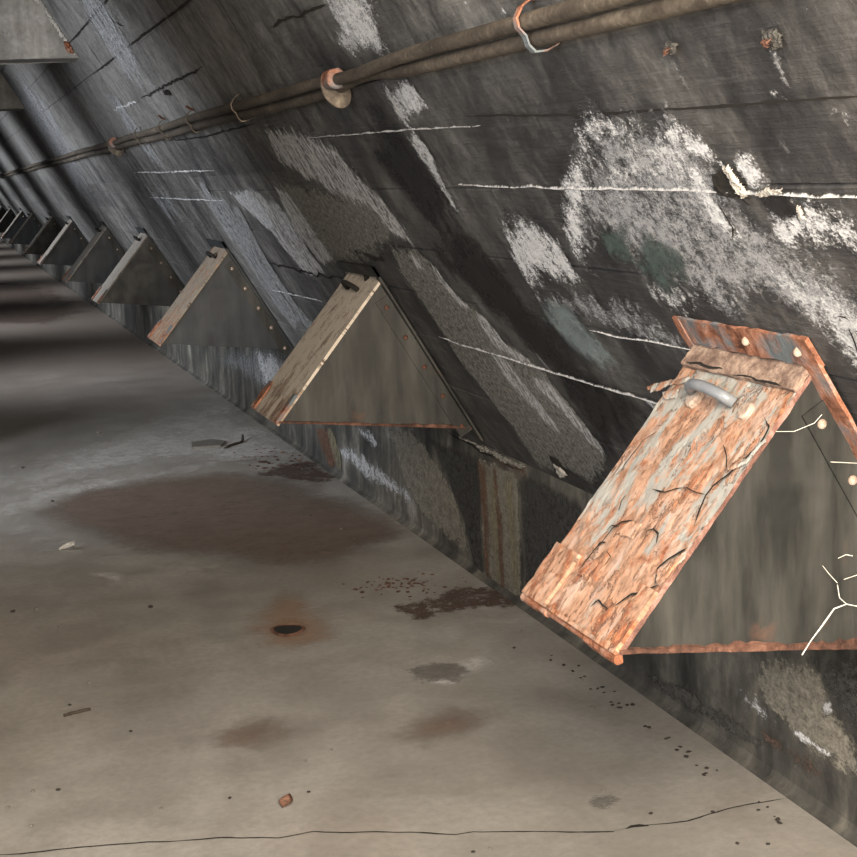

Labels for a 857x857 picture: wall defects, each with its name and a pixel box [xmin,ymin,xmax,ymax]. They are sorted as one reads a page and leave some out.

spalling [34,0,76,55]
crack [69,0,205,98]
crack [273,4,328,27]
peeling [711,164,806,220]
damp [370,80,679,452]
damp [503,111,857,366]
damp [56,408,280,473]
damp [340,449,411,503]
damp [45,474,393,561]
rust [264,602,320,642]
rust [619,637,857,655]
crack [0,798,785,855]